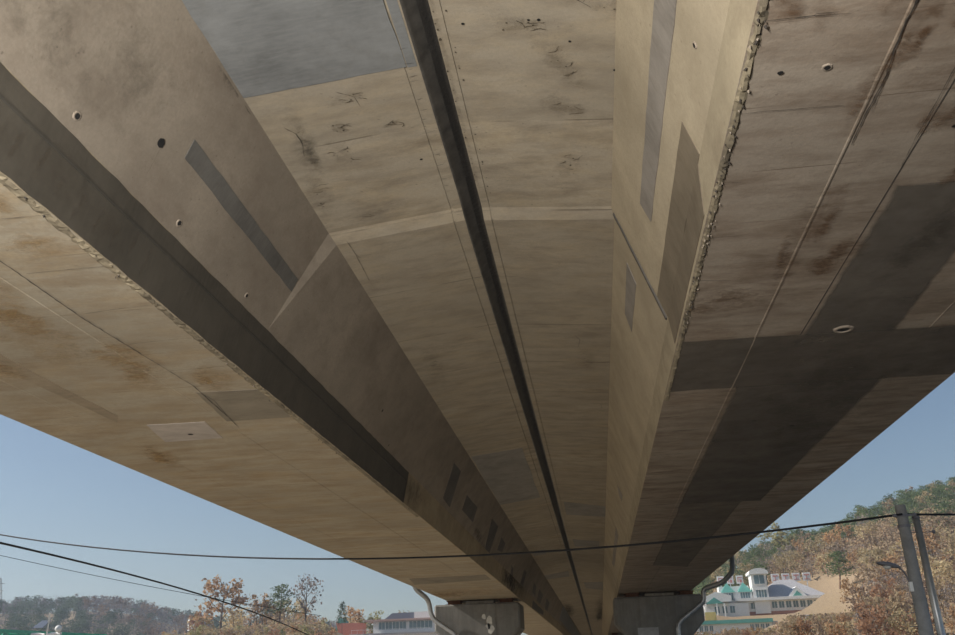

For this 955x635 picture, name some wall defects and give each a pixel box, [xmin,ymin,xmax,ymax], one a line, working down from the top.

spalling [664,0,770,401]